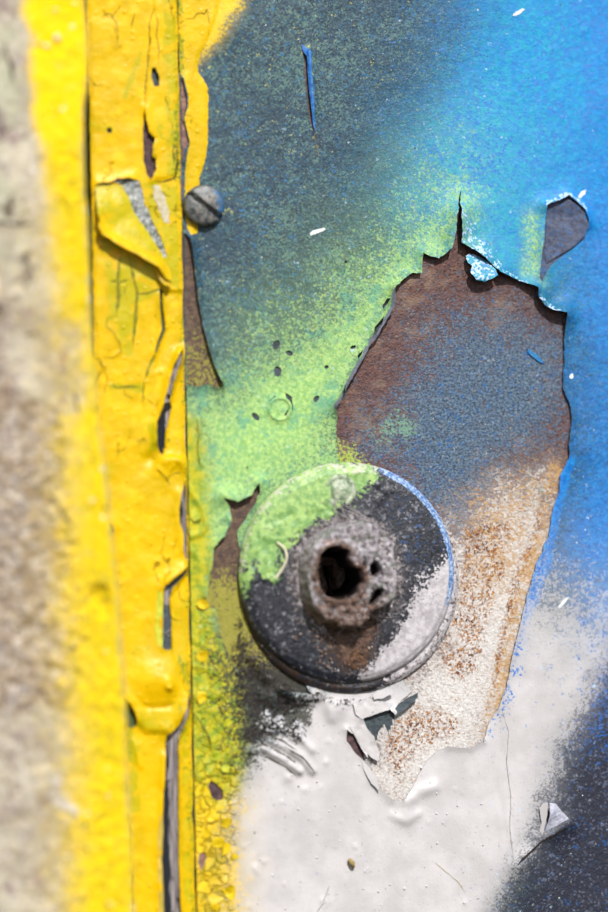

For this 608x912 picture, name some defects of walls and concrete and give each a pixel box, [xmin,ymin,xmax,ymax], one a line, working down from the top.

crack [103,8,159,101]
crack [95,175,131,186]
peeling [95,111,172,352]
crack [156,145,178,182]
crack [102,256,161,401]
peeling [155,483,203,650]
peeling [196,484,310,694]
peeling [336,192,589,802]
rust [493,531,537,687]
peeling [158,691,207,912]
peeling [195,780,238,870]
peeling [518,802,569,865]